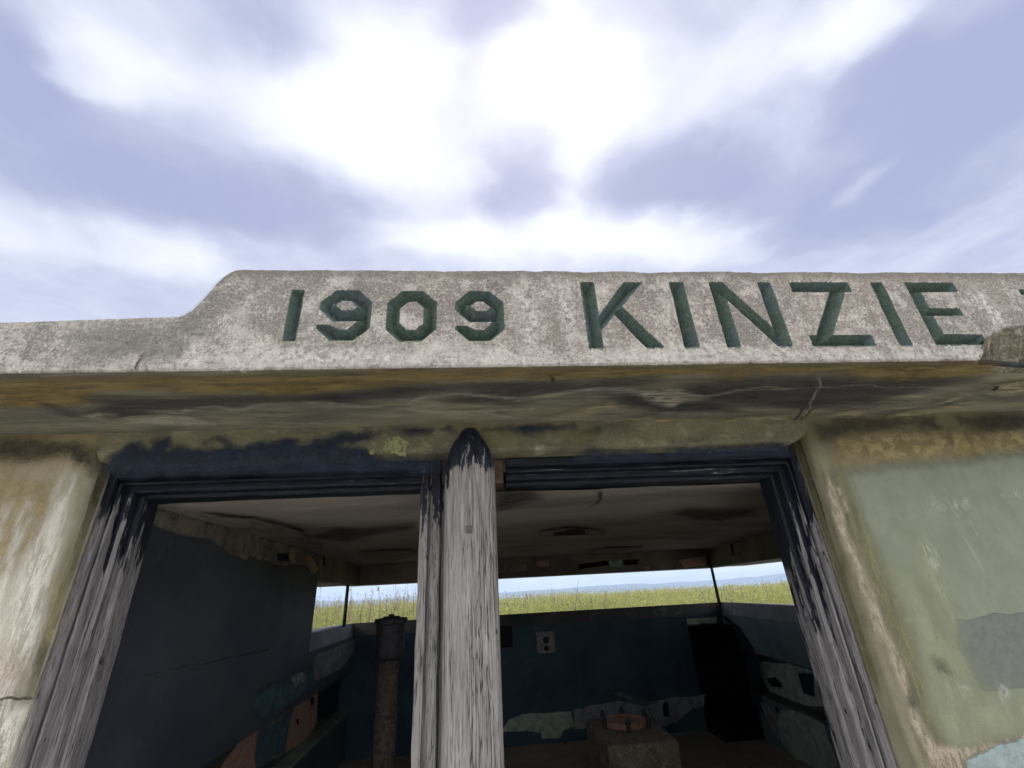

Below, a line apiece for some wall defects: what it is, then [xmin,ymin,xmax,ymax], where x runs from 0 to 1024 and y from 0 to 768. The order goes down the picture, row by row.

damp [88,399,255,425]
peeling [369,436,411,457]
damp [450,379,1024,465]
damp [0,432,445,768]
peeling [827,454,1024,768]